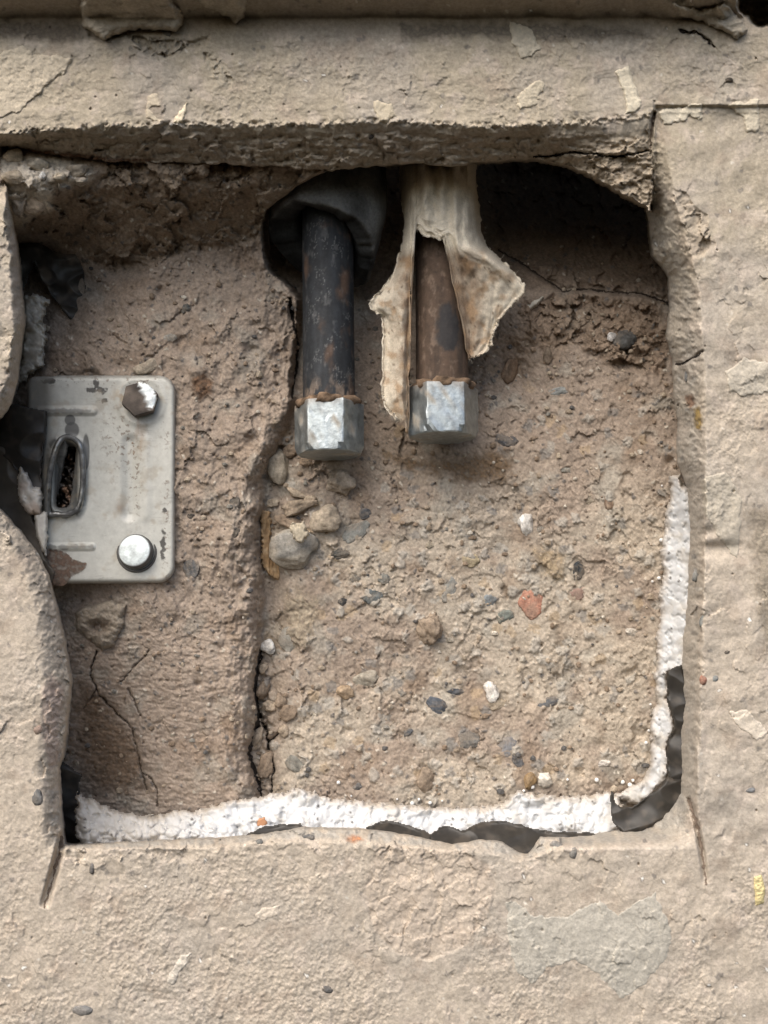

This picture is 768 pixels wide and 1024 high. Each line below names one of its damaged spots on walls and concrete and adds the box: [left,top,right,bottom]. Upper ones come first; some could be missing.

crack [679,29,715,48]
crack [533,150,648,158]
rust [411,376,476,389]
crack [83,651,158,807]
crack [247,649,279,796]